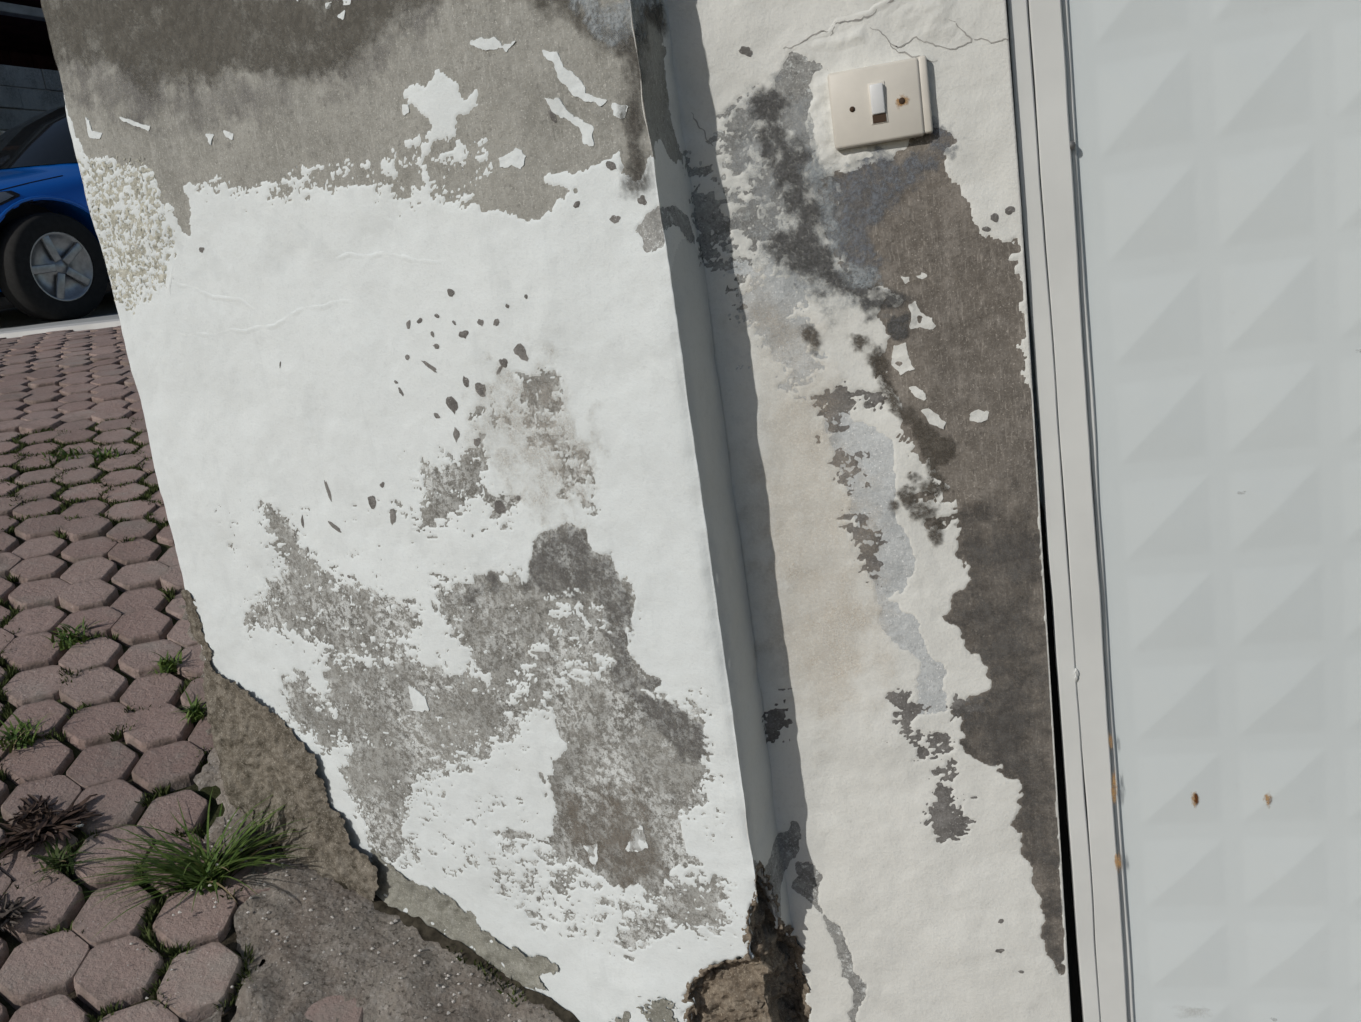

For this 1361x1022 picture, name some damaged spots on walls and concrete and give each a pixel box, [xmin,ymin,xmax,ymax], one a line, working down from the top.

water stain [41,0,433,90]
water stain [535,0,666,191]
crack [784,0,1008,62]
peeling [41,0,1065,1022]